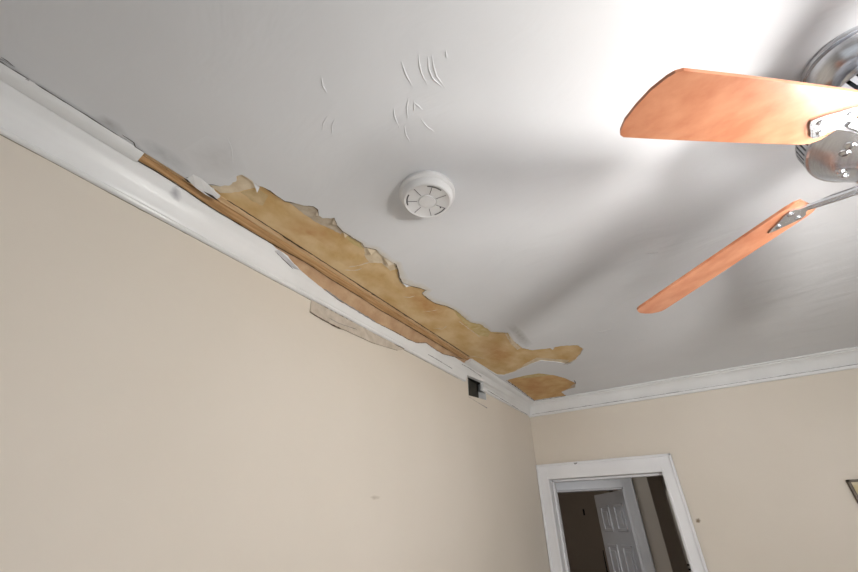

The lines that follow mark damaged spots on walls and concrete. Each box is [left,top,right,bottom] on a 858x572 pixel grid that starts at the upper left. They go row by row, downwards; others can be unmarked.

peeling [184,175,583,401]
spalling [468,378,487,408]